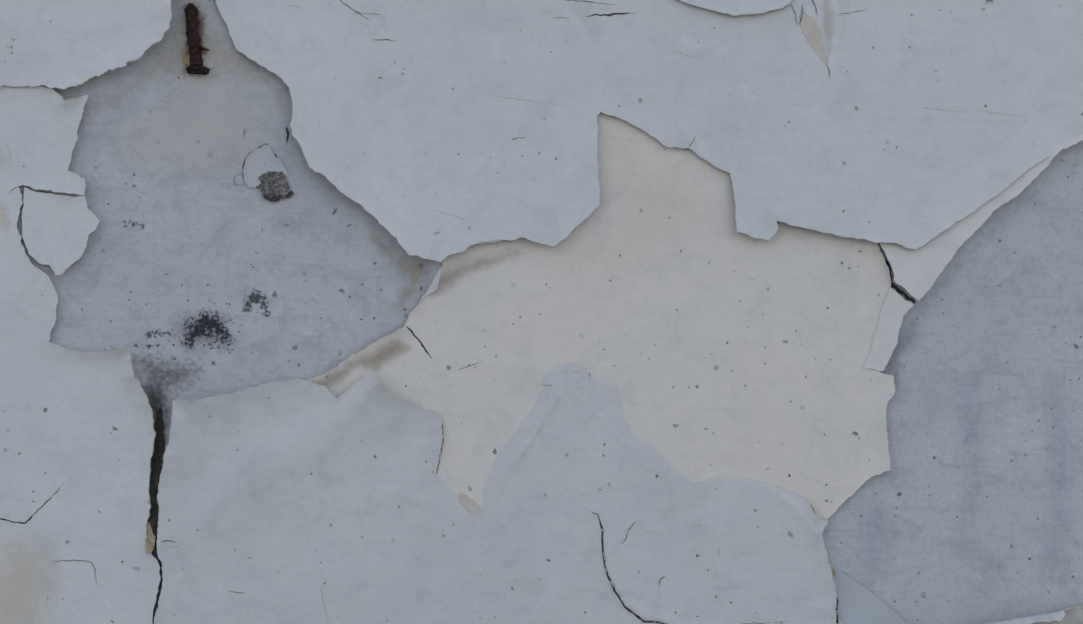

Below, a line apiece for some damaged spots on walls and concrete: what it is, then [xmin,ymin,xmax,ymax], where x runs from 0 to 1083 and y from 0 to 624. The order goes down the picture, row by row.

leakage [135,288,283,360]
peeling [215,0,1083,519]
crack [880,250,915,303]
crack [0,488,60,524]
crack [148,406,165,623]
peeling [153,363,908,624]
crack [590,511,666,624]